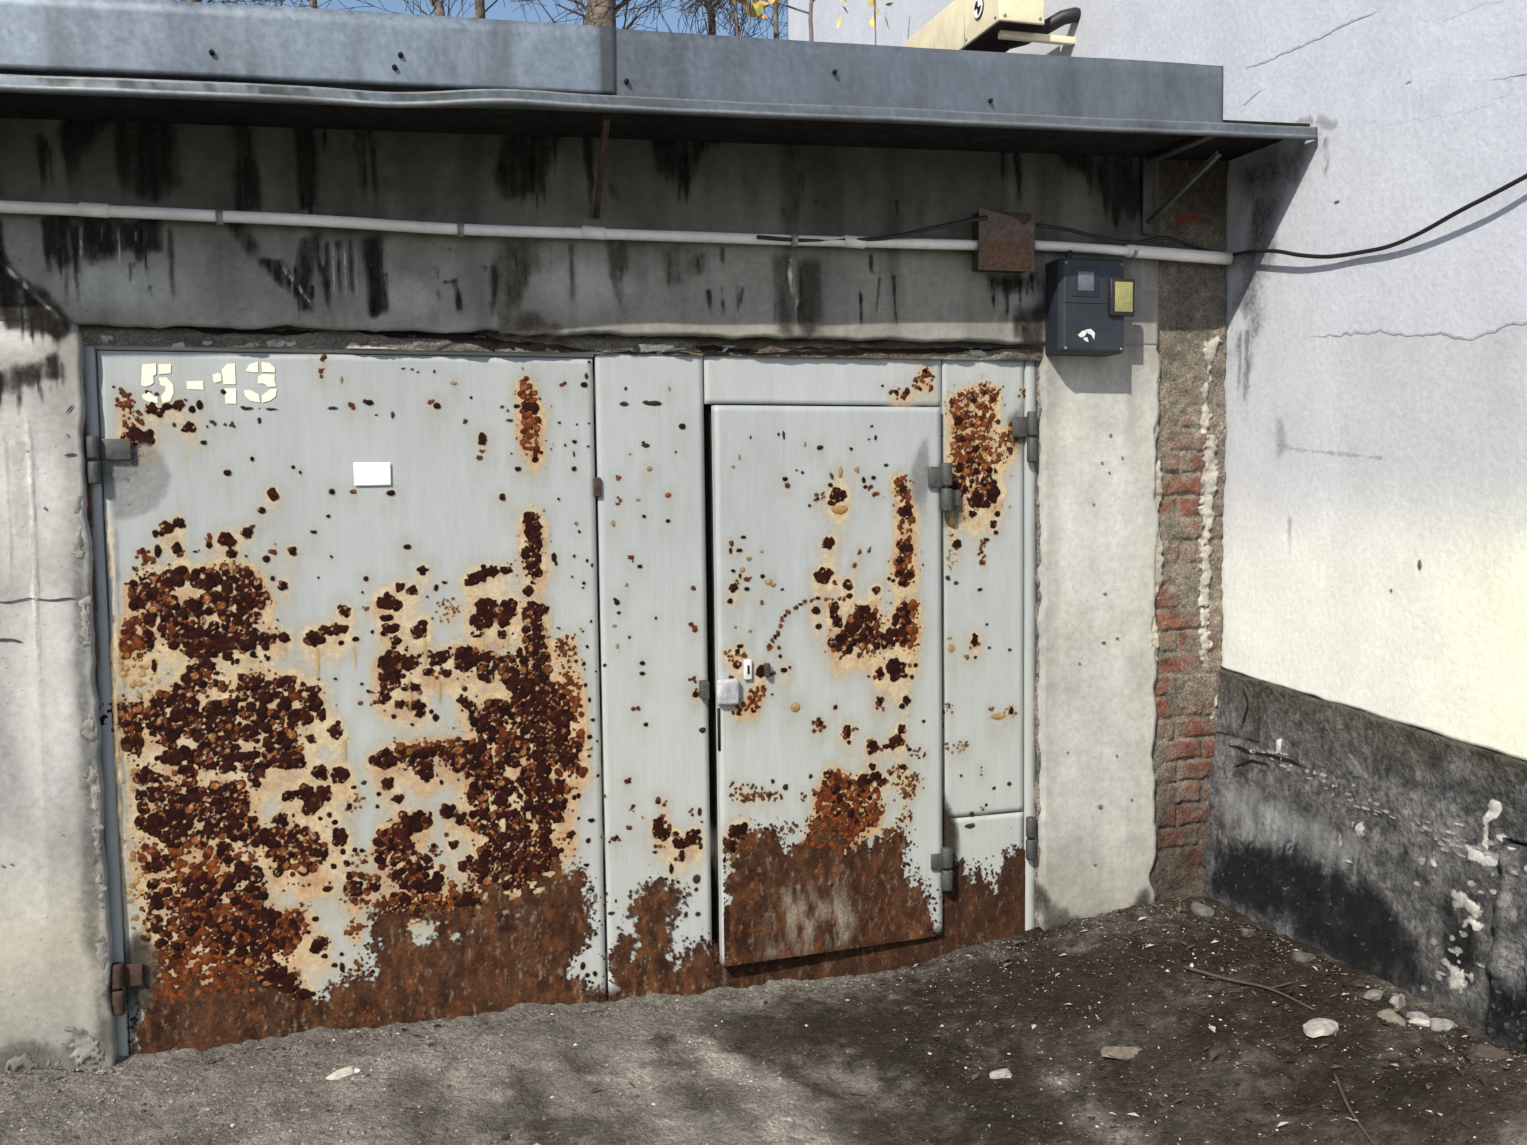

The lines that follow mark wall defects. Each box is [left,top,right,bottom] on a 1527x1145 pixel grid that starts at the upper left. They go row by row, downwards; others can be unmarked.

leakage [36,120,179,200]
leakage [42,215,174,287]
leakage [230,126,387,317]
leakage [483,241,557,332]
leakage [775,256,821,334]
leakage [859,255,896,321]
leakage [990,275,1045,348]
crack [1307,321,1527,340]
rust [112,386,235,481]
rust [500,368,590,472]
rust [881,367,1026,585]
rust [84,419,1025,1054]